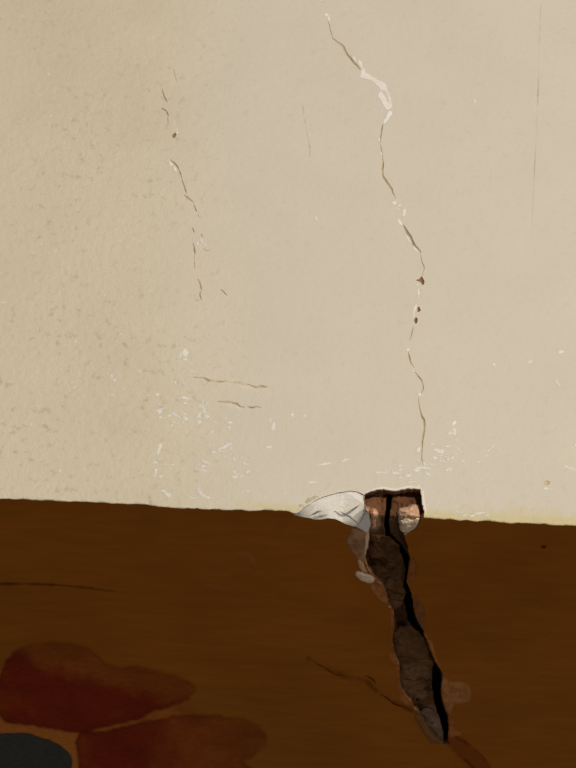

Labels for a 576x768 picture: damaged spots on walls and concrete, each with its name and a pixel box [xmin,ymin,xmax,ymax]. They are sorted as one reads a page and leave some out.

crack [324,12,362,70]
crack [378,125,426,464]
spalling [295,490,371,533]